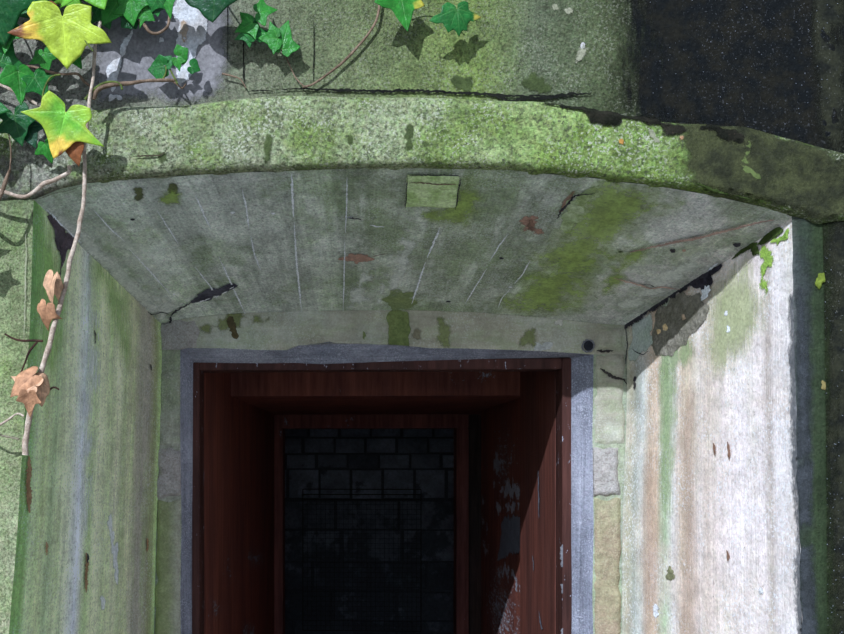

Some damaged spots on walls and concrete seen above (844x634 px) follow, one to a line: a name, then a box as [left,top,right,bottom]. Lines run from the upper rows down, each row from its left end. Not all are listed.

crack [227,7,592,101]
rust [519,215,544,235]
crack [630,219,774,253]
crack [148,283,238,325]
crack [597,263,722,384]
spalling [651,291,709,376]
water stain [623,0,844,634]
peeling [480,410,520,634]